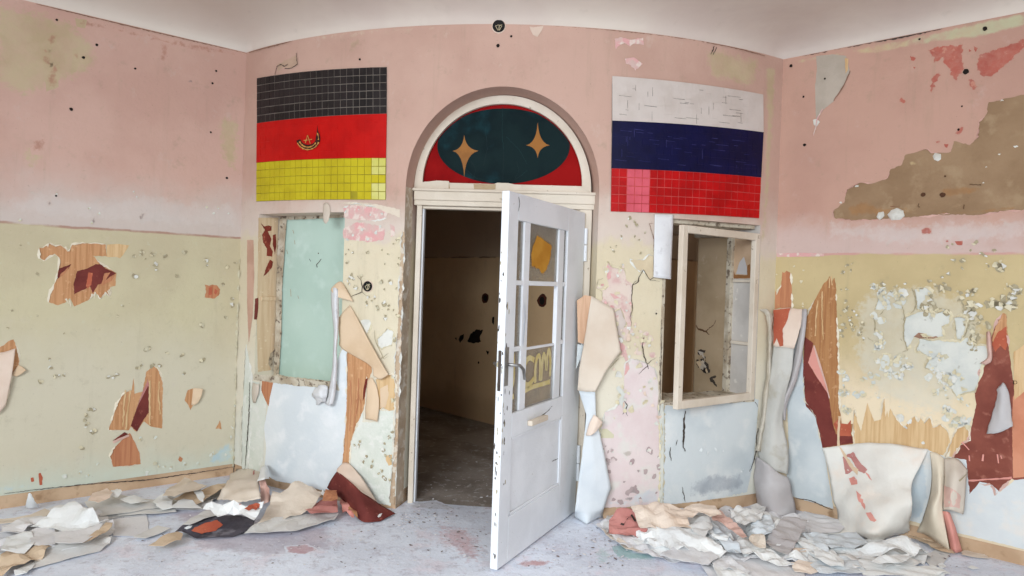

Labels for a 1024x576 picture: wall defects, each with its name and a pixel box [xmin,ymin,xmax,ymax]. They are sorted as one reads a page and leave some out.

peeling [813,54,850,136]
spalling [833,95,1024,221]
flaking render [264,181,588,506]
crack [630,270,686,458]
flaking render [597,216,759,508]
flaking render [787,338,833,509]
peeling [837,240,1023,430]
flaking render [910,441,1024,549]